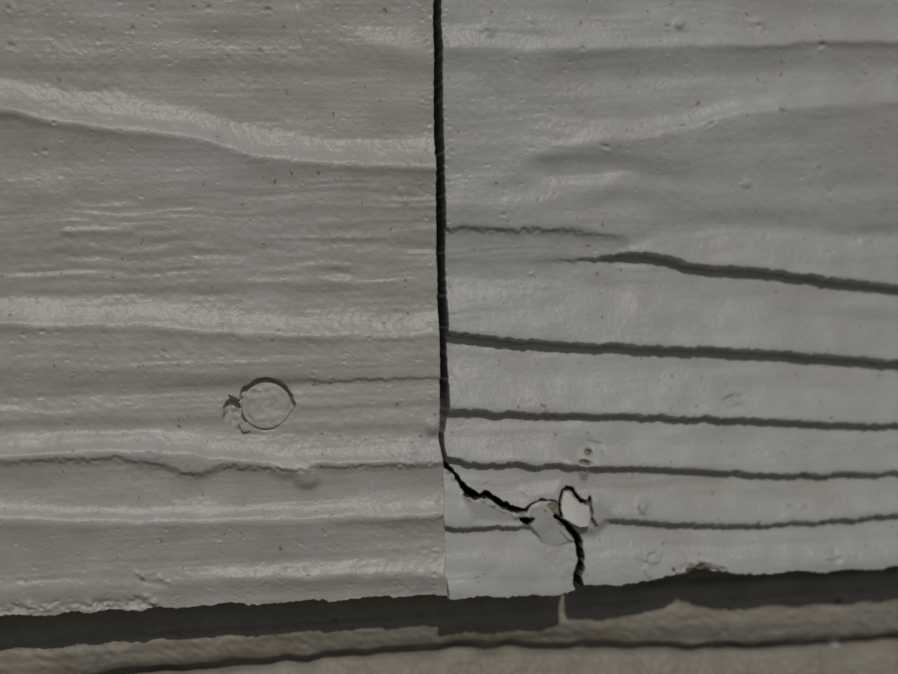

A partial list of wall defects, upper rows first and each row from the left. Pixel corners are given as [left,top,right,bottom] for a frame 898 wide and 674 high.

crack [443,460,585,585]